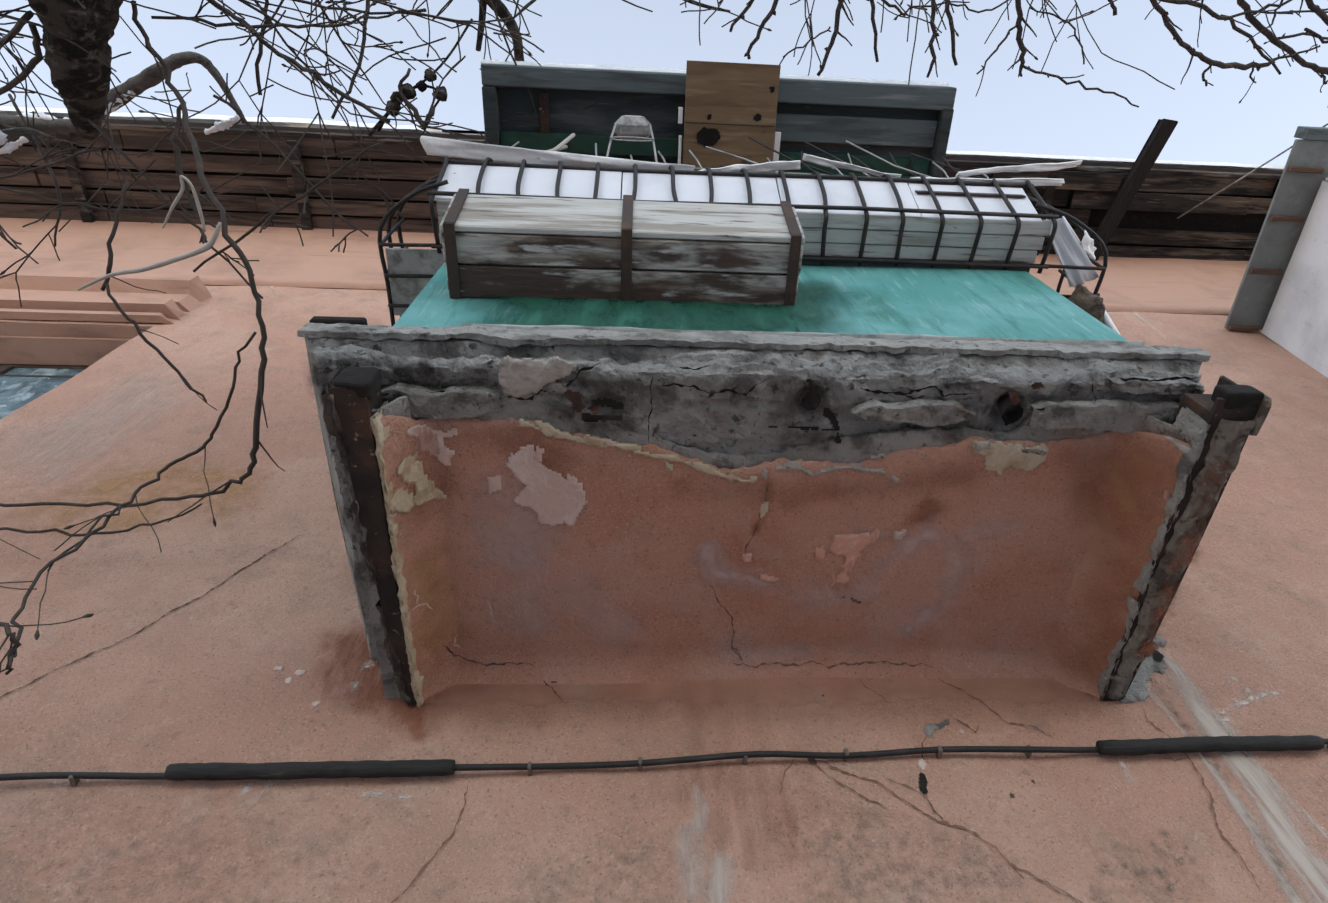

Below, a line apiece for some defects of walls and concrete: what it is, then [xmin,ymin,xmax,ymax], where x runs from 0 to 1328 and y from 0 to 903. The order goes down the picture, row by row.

peeling [382,424,457,551]
peeling [487,355,900,526]
crack [648,365,766,442]
crack [861,386,973,400]
peeling [971,440,1049,475]
spalling [997,382,1044,426]
crack [1091,377,1194,404]
crack [0,537,296,698]
crack [710,585,1083,903]
leakage [1165,659,1328,903]